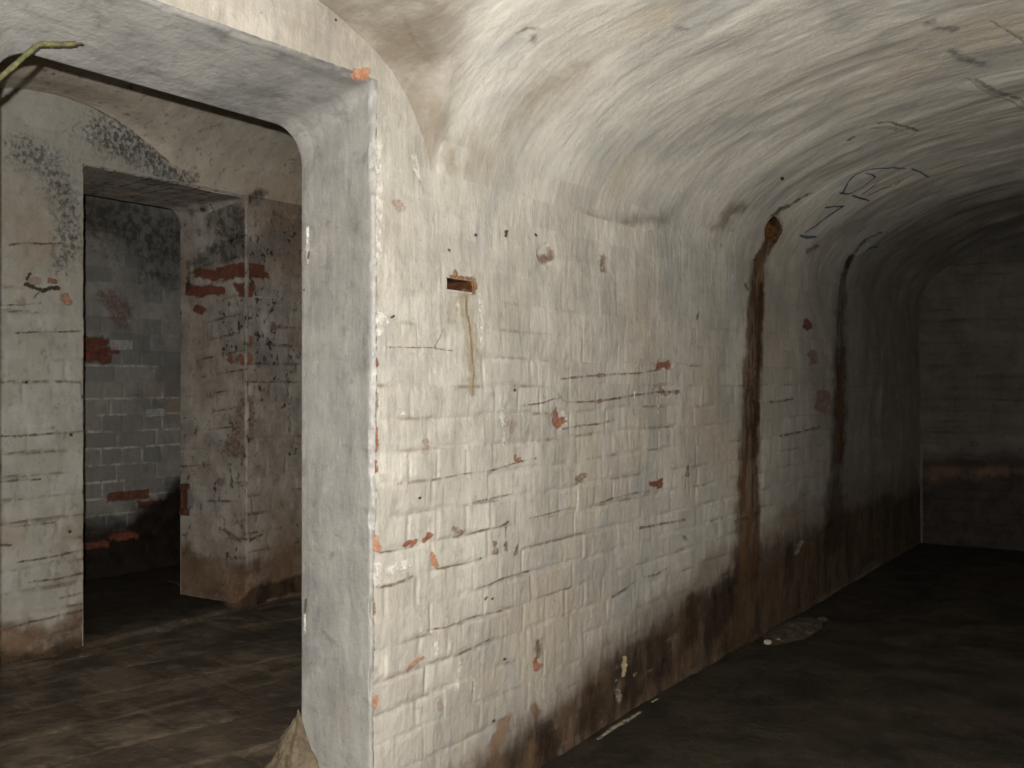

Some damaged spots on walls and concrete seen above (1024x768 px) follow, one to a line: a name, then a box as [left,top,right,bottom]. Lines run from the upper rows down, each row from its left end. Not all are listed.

flaking render [350,68,370,81]
mould [83,119,190,183]
flaking render [181,262,269,315]
flaking render [83,291,133,365]
flaking render [552,408,568,428]
corrosion [724,237,774,655]
corrosion [826,256,852,552]
flaking render [107,489,161,509]
leakage [83,479,302,646]
flaking render [403,532,439,568]
leakage [753,458,1024,641]
leakage [481,576,737,768]